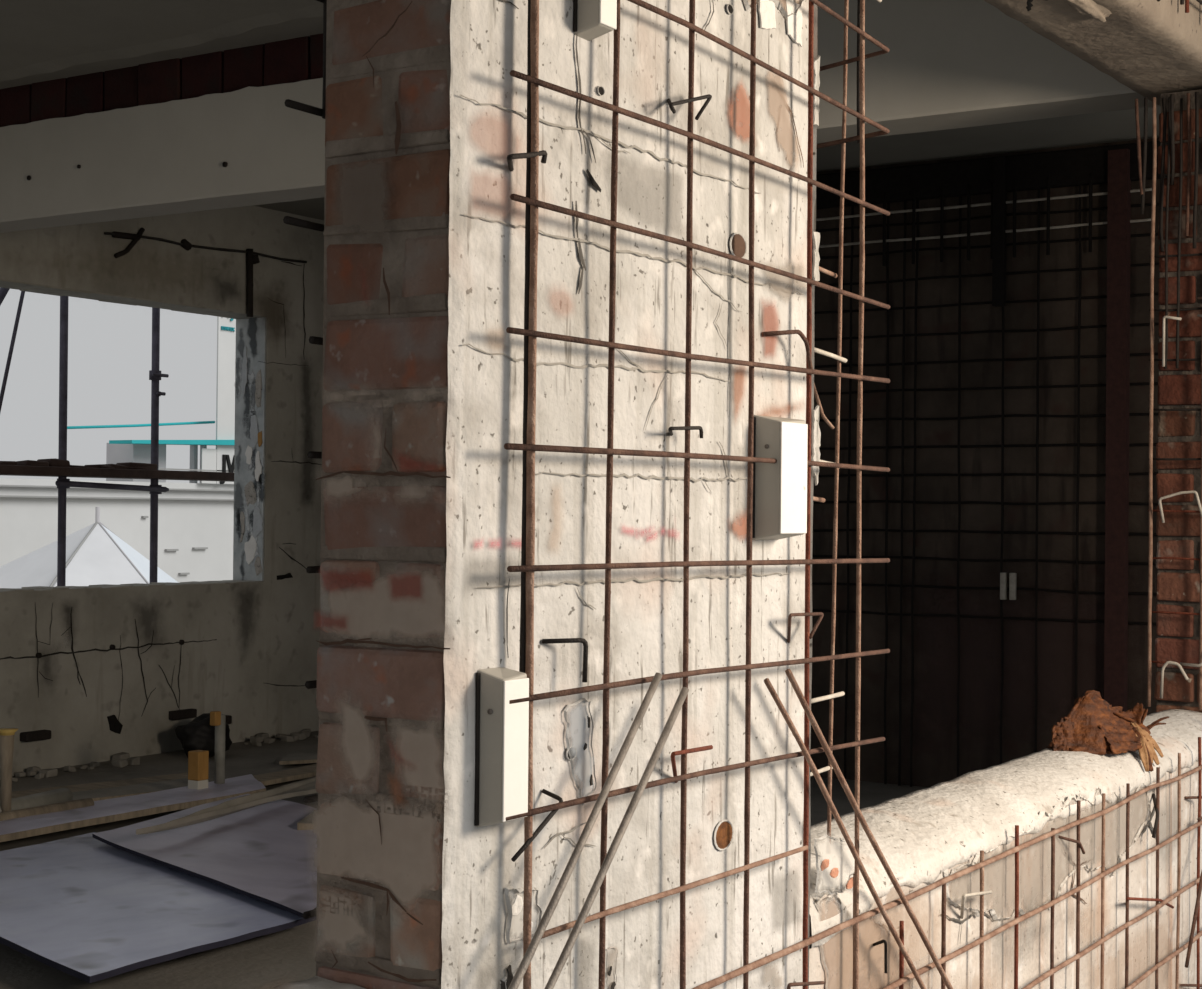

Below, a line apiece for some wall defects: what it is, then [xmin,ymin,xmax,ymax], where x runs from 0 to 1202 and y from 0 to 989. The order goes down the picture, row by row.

spalling [285,0,327,119]
spalling [283,216,324,232]
crack [461,34,804,492]
spalling [309,336,323,345]
corrosion [764,306,778,354]
peeling [233,317,320,581]
spalling [500,0,1202,989]
crack [0,604,217,721]
spalling [302,909,317,919]